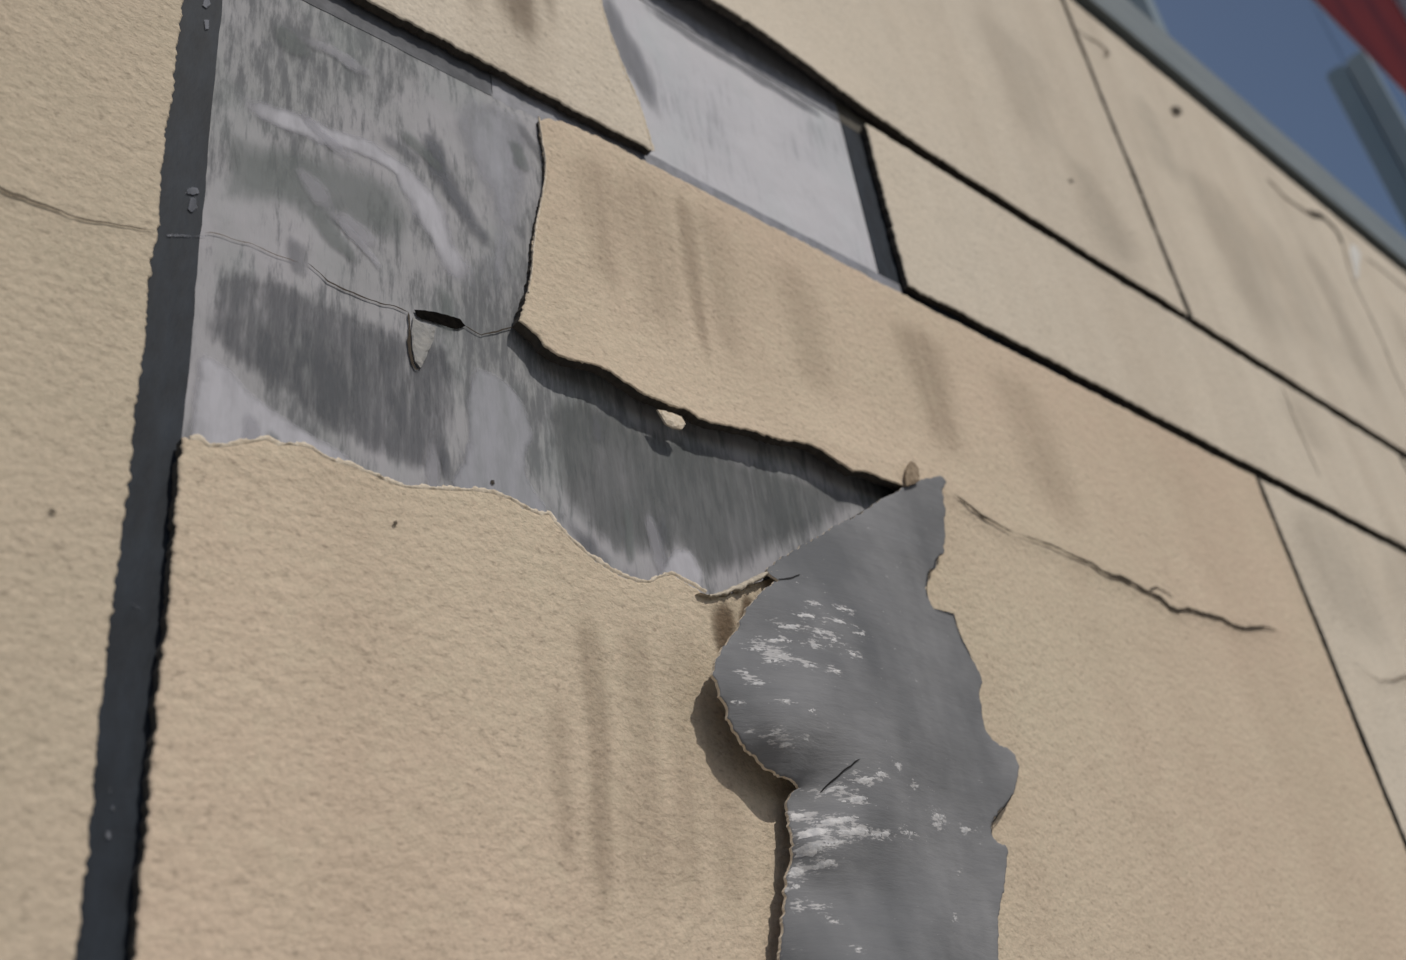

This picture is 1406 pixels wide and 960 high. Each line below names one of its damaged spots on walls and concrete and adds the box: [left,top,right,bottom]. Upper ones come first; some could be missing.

crack [0,186,149,230]
peeling [168,0,1019,960]
crack [954,493,1276,630]